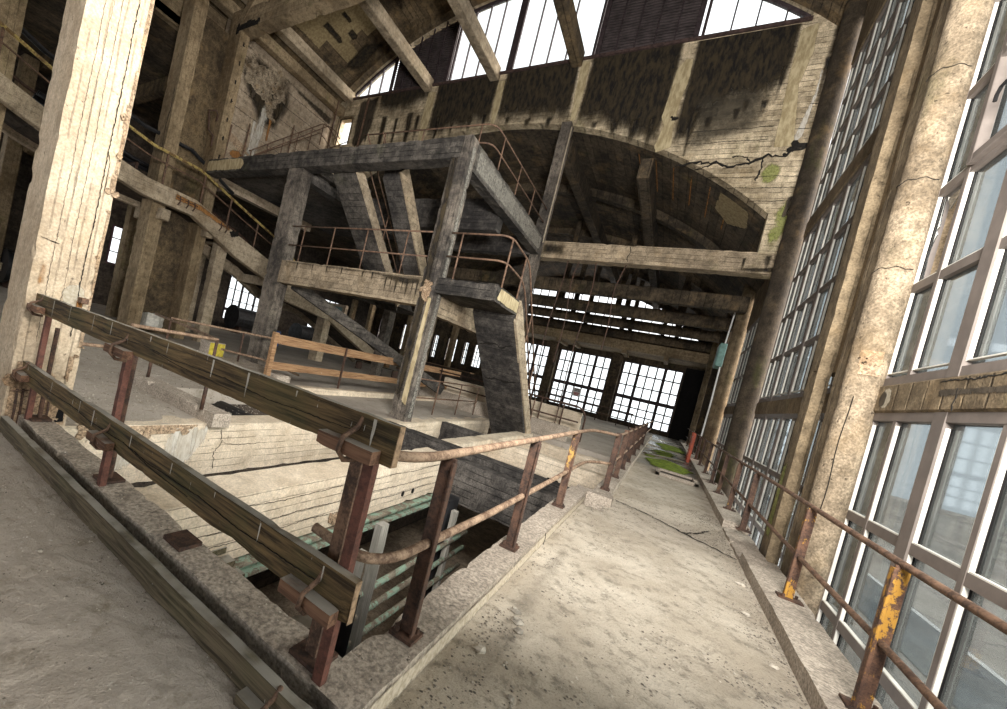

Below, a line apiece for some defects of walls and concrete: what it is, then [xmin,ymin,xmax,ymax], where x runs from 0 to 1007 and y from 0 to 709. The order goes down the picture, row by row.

spalling [234,17,288,123]
leakage [352,92,452,147]
leakage [629,59,693,152]
leakage [684,109,712,152]
crack [675,126,807,202]
crack [941,372,1007,411]
crack [820,396,854,509]